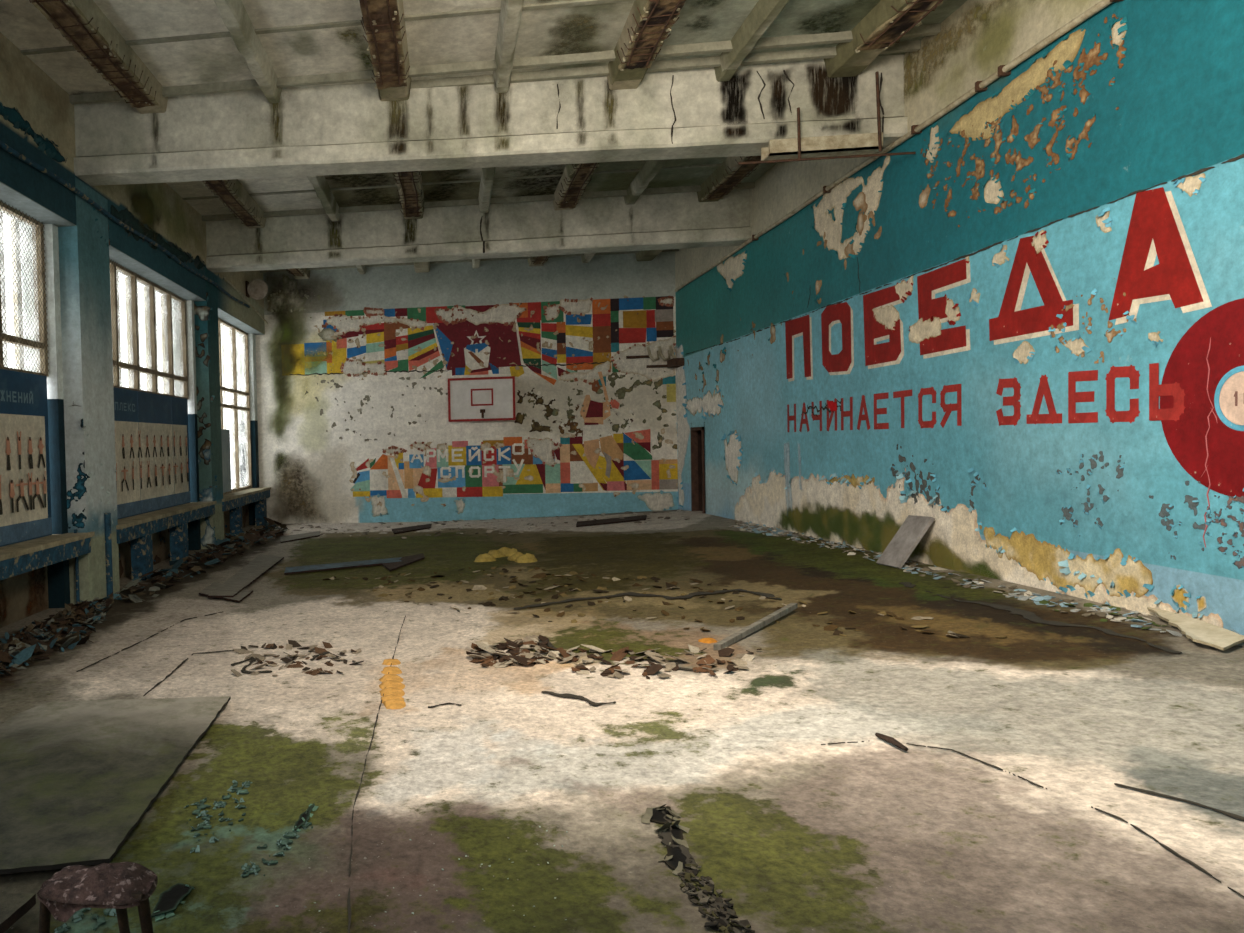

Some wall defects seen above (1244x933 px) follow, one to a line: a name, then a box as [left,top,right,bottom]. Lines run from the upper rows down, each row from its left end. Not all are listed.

water stain [720,71,750,137]
water stain [768,71,788,137]
water stain [807,66,859,132]
peeling [919,14,1128,227]
peeling [803,156,890,270]
water stain [278,463,315,519]
peeling [267,268,782,517]
peeling [721,430,1223,628]
crack [1201,337,1218,547]
crack [347,616,406,933]
crack [906,743,1047,789]
crack [1091,783,1244,898]